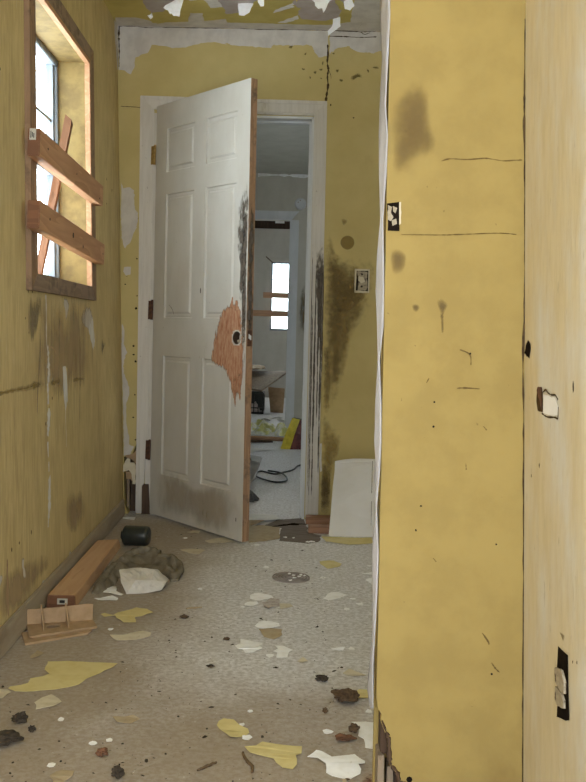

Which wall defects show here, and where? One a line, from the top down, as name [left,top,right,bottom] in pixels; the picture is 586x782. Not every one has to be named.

crack [116,26,216,64]
crack [322,30,376,101]
water stain [400,96,428,158]
water stain [341,236,354,249]
crack [0,378,83,395]
peeling [114,0,390,708]
water stain [300,255,363,503]
crack [442,19,526,782]
peeling [95,586,123,600]
peeling [101,607,152,640]